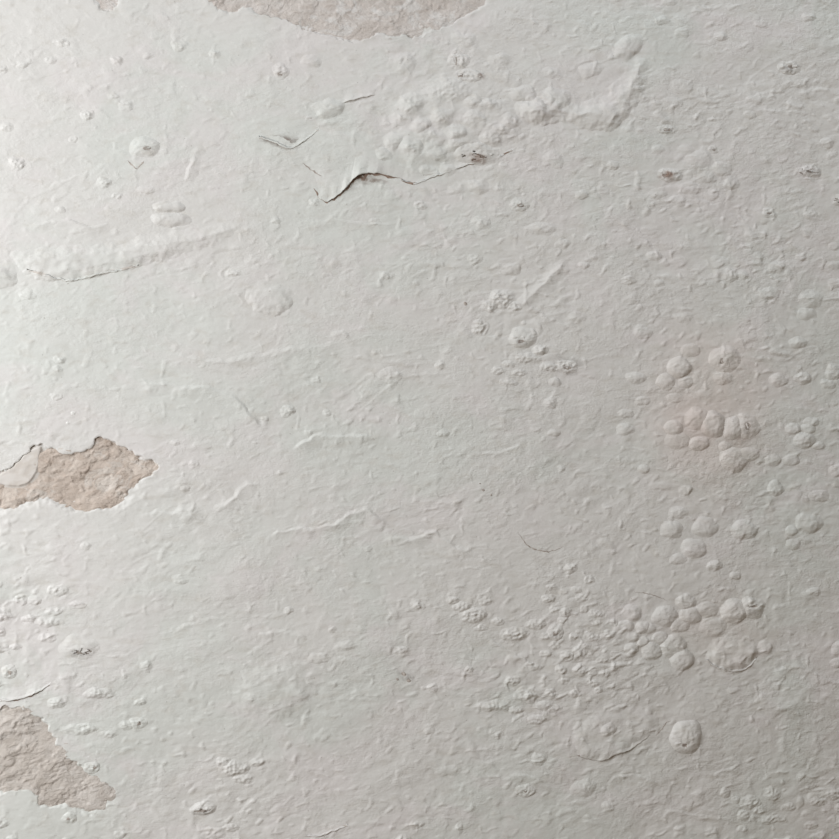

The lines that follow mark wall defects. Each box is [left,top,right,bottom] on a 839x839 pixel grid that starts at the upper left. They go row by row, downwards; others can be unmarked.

peeling [208,0,485,50]
peeling [0,427,163,512]
peeling [0,675,122,812]